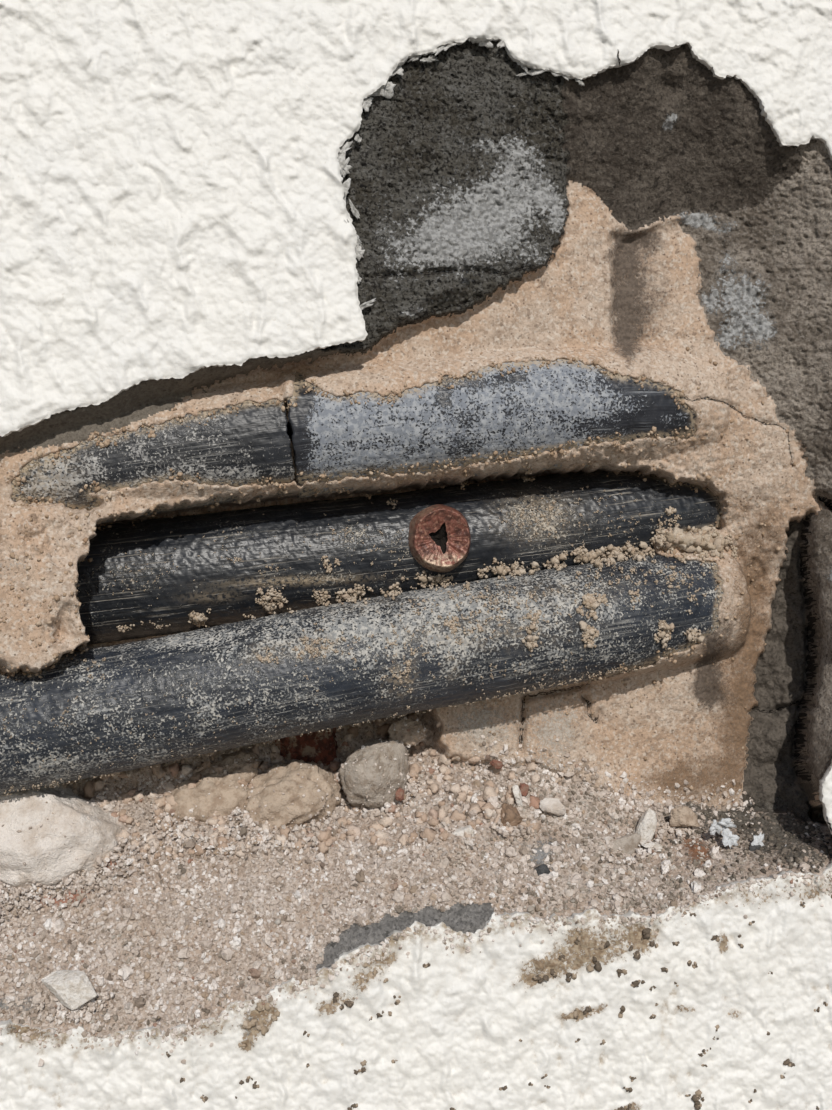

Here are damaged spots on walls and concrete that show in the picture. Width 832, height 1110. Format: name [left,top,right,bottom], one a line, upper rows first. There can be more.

spalling [0,38,832,875]
spalling [0,744,812,1036]